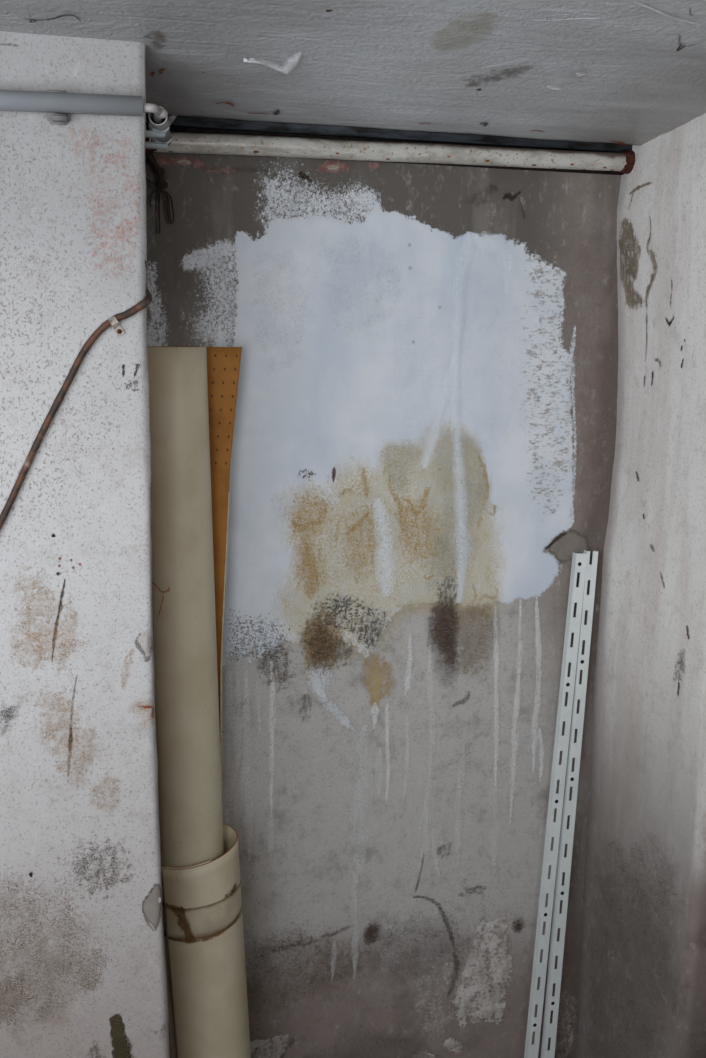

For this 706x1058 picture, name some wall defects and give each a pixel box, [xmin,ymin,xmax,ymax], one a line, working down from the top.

damp [256,418,507,730]
spalling [545,529,591,564]
damp [245,875,483,1034]